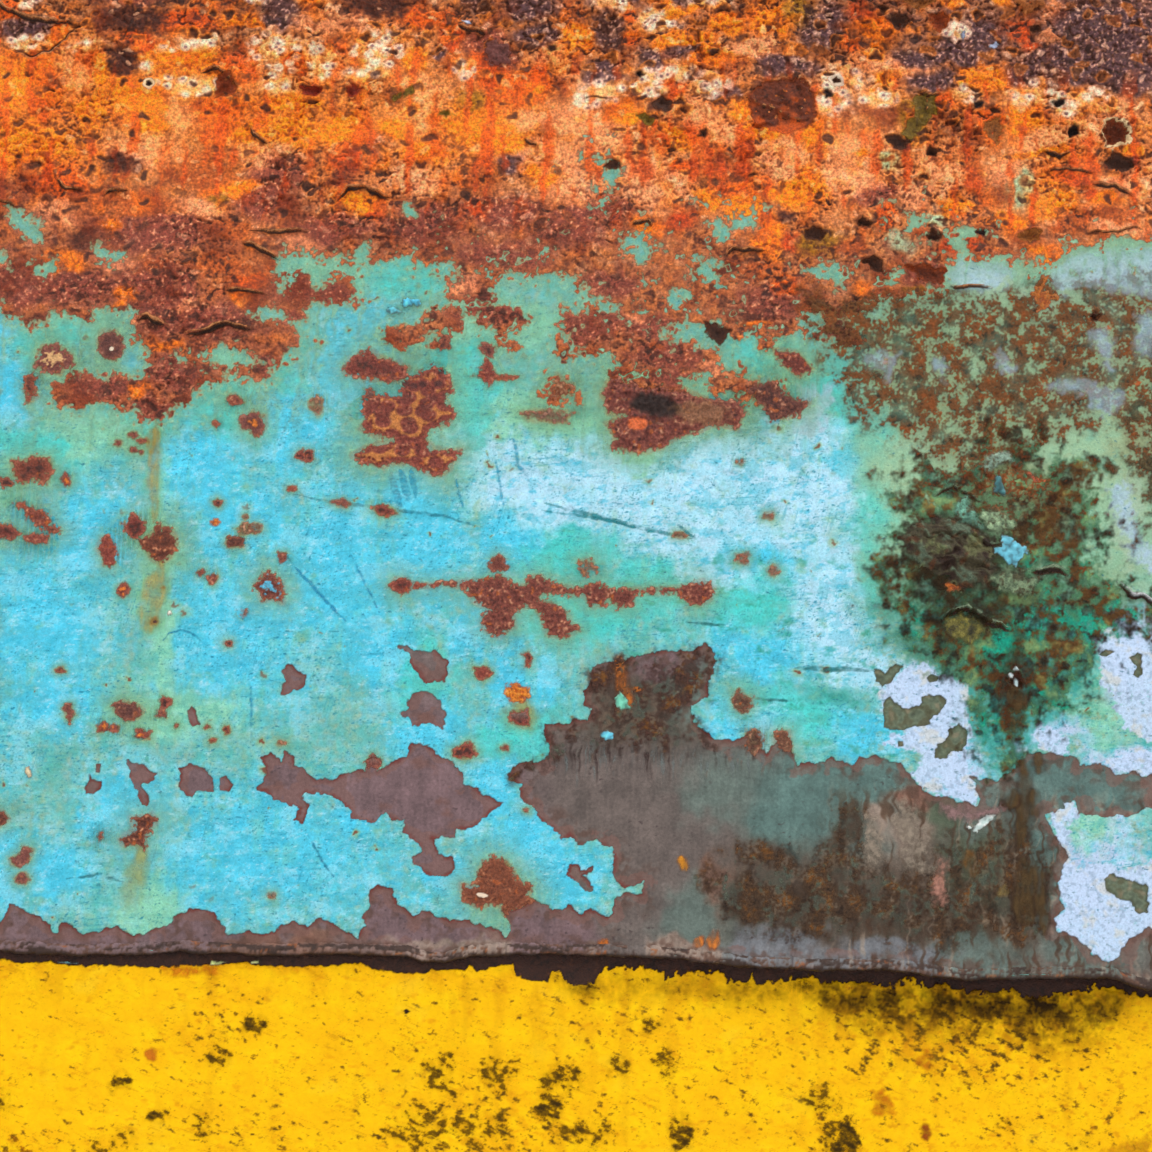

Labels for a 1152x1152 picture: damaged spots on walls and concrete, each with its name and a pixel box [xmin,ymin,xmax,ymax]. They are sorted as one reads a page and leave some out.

corrosion [0,0,1152,549]
corrosion [388,553,715,640]
corrosion [9,845,35,885]
corrosion [119,813,159,882]
corrosion [459,854,536,918]
peeling [0,642,1152,979]
corrosion [678,802,1052,963]
corrosion [0,934,1152,999]